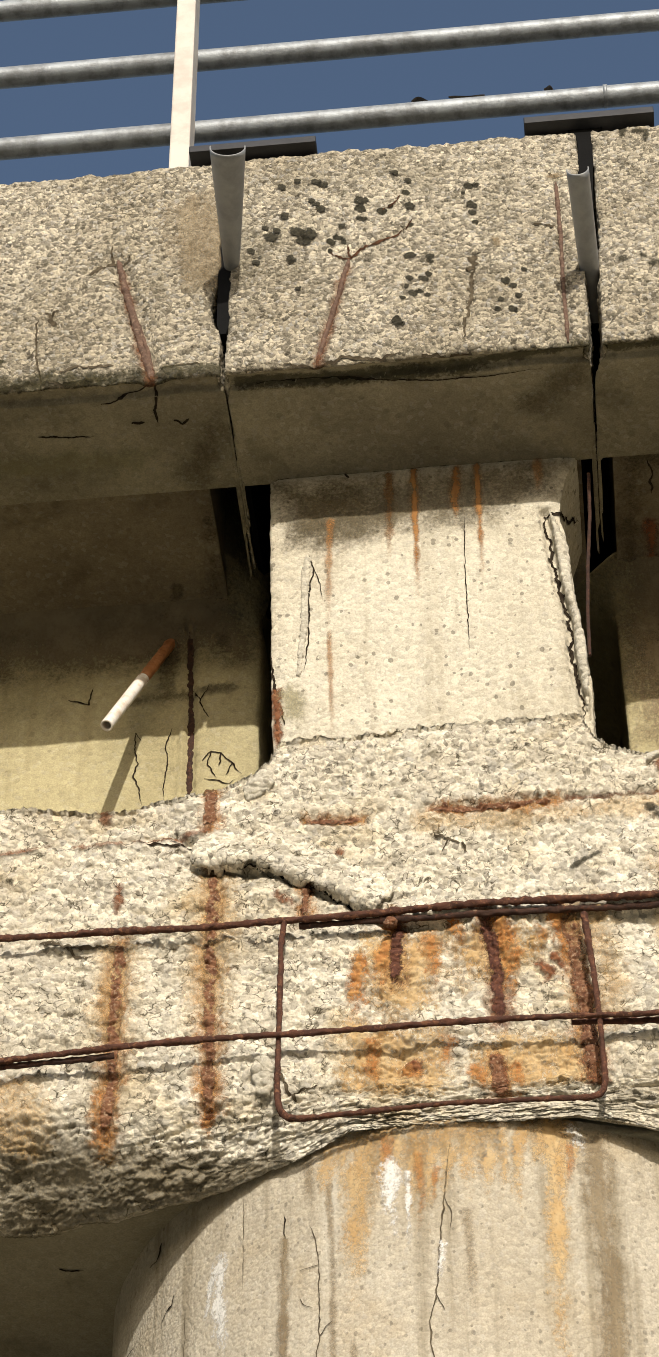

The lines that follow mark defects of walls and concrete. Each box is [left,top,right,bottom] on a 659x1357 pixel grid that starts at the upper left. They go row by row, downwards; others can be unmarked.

crack [270,556,322,746]
rust [409,469,419,574]
leakage [274,462,557,547]
crack [543,511,586,719]
crack [202,751,241,784]
rust [114,885,124,914]
peeling [0,632,659,1145]
rust [334,904,612,1096]
leakage [204,1254,228,1348]
leakage [276,1236,289,1357]
crack [429,1145,452,1357]
rust [317,1116,630,1357]